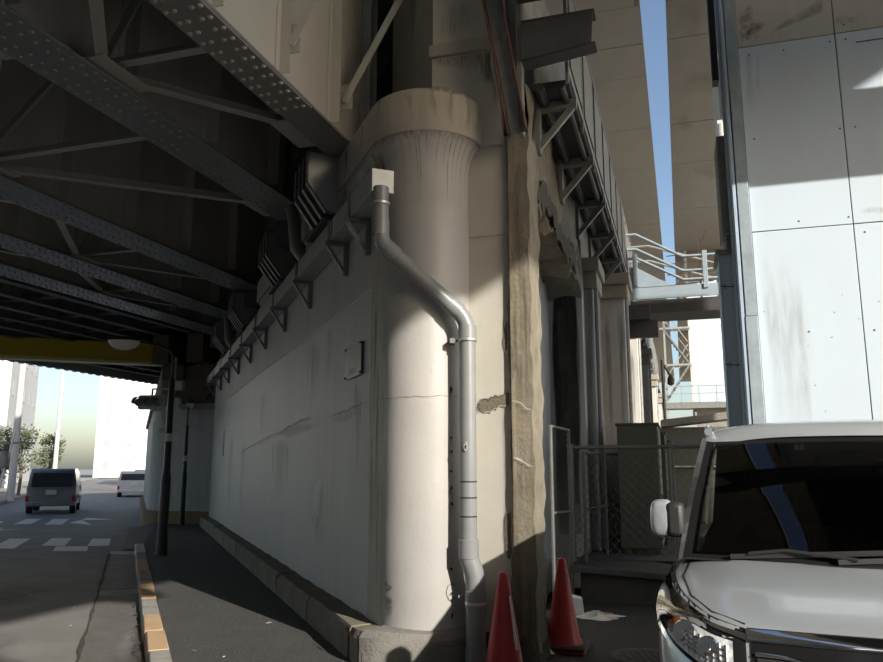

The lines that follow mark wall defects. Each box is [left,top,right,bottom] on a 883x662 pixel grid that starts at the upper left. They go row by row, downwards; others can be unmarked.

peeling [478,150,515,613]